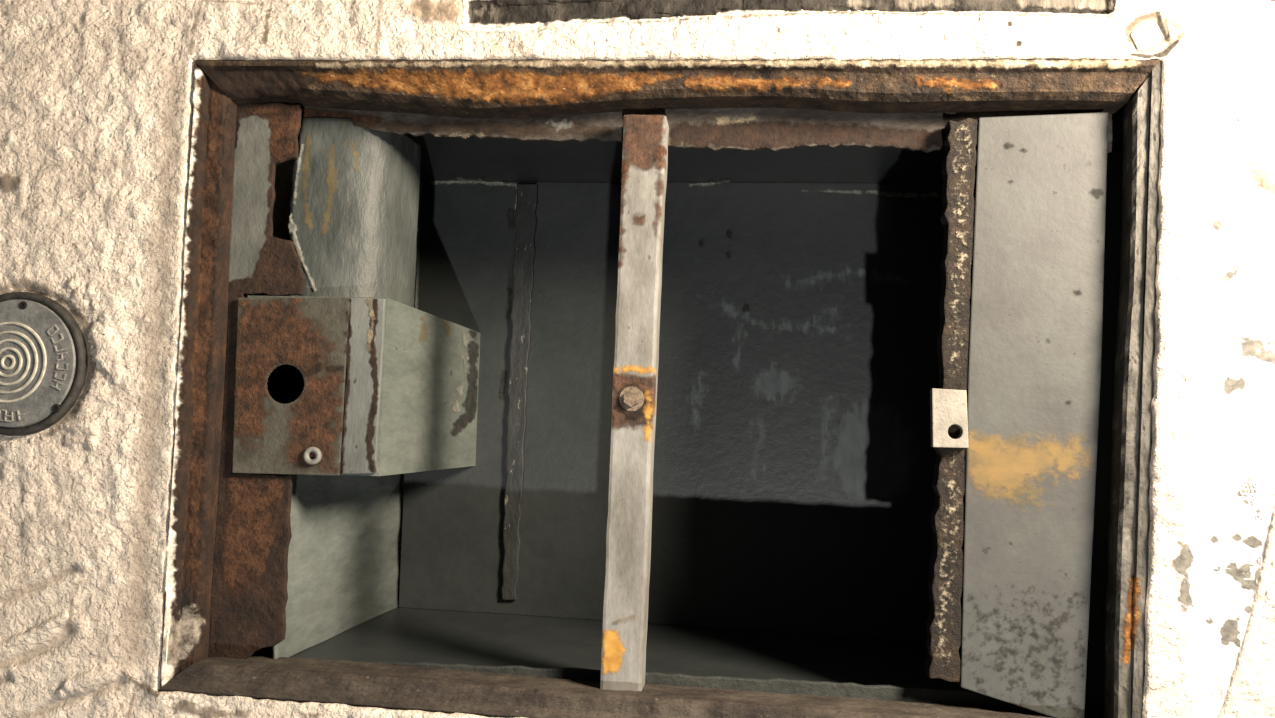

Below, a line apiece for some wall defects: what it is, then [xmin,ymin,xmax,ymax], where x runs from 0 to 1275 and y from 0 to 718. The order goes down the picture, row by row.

spalling [460,0,629,33]
rust [916,76,997,93]
rust [172,63,943,643]
spalling [159,11,1182,718]
rust [1122,577,1141,664]